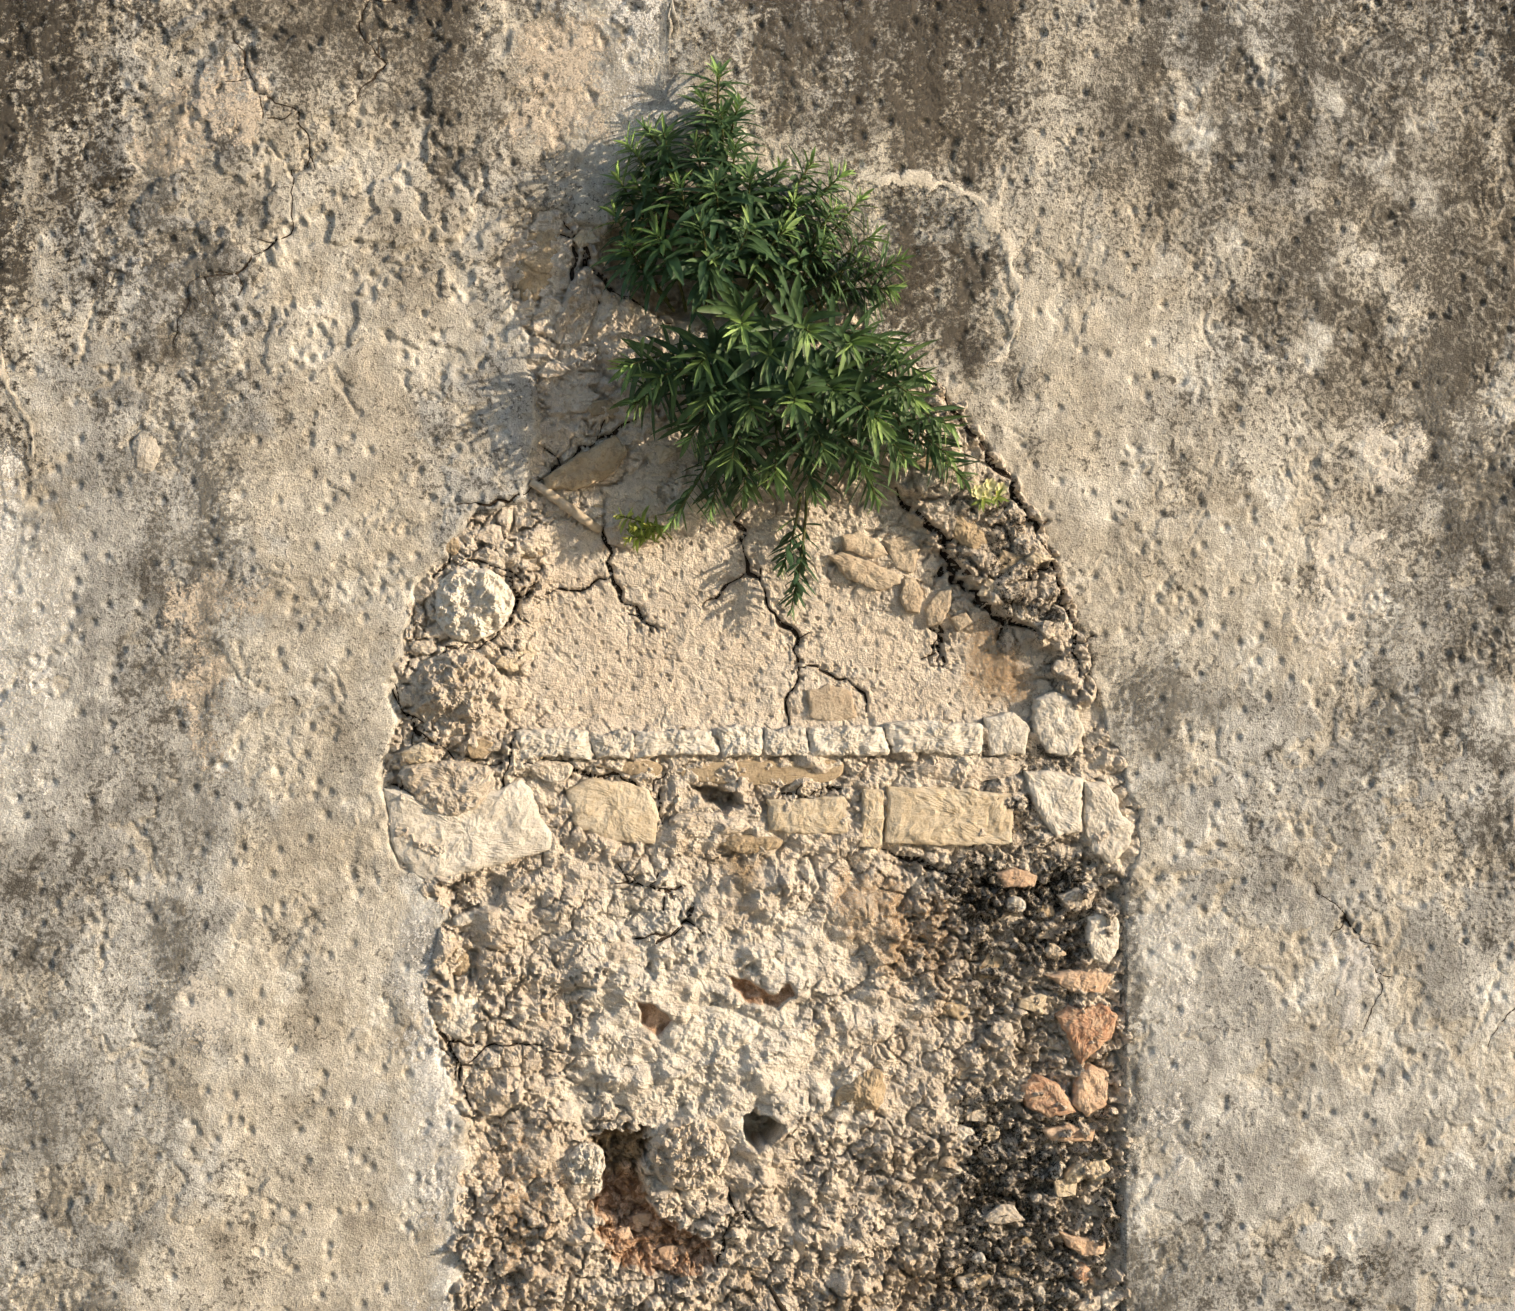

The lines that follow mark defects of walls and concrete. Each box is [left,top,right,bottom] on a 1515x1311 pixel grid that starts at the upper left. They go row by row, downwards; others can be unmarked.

crack [173,31,316,345]
leakage [580,0,1076,383]
leakage [1316,0,1515,268]
leakage [0,0,299,1311]
spalling [389,509,553,771]
crack [433,526,658,654]
crack [703,500,868,726]
spalling [503,191,1097,711]
crack [895,382,1094,668]
spalling [586,1122,725,1290]
spalling [891,858,1133,1311]
leakage [915,727,1224,1311]